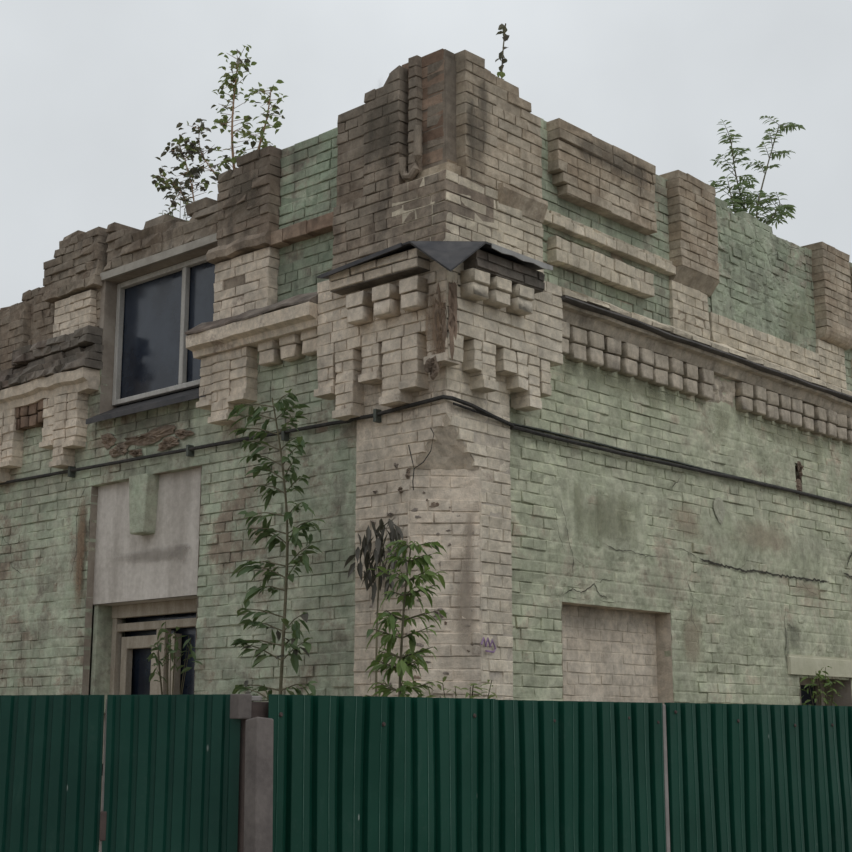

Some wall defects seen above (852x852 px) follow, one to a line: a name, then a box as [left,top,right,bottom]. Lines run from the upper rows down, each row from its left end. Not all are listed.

crack [679,548,852,594]